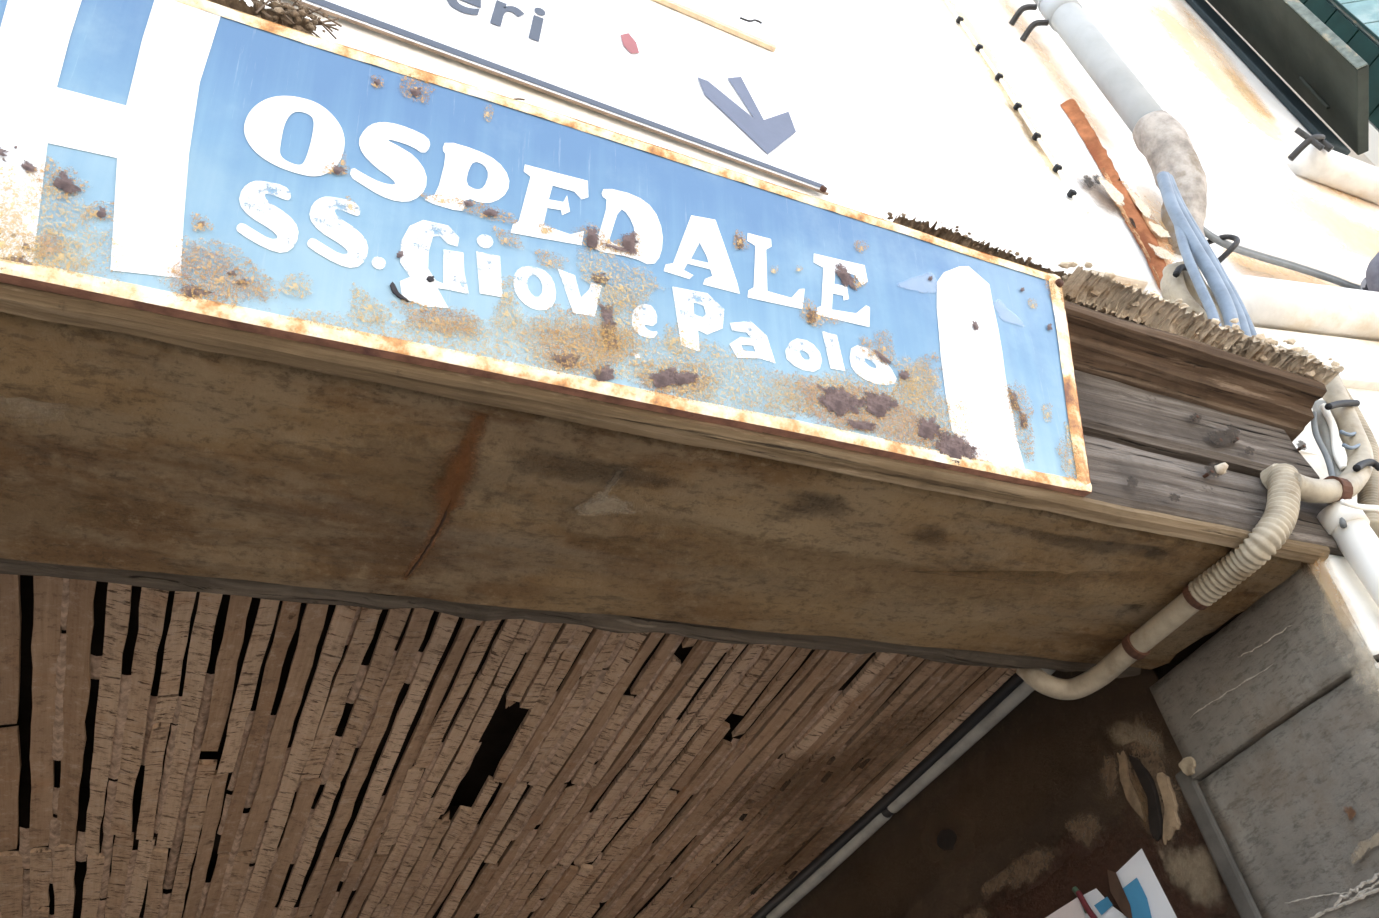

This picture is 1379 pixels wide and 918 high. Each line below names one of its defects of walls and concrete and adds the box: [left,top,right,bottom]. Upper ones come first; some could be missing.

corrosion [402,412,488,581]
flaking render [950,714,1233,918]